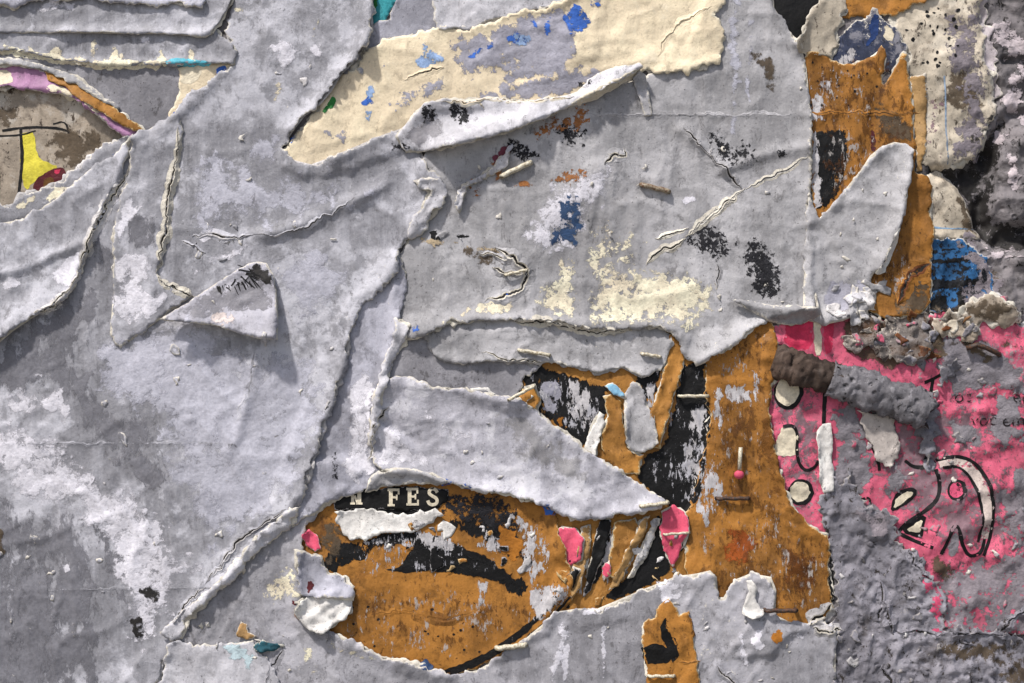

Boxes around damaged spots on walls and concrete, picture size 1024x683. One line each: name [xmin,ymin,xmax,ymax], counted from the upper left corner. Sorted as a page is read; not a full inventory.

crack [156,128,354,298]
crack [478,247,631,337]
crack [445,95,920,265]
crack [39,509,286,627]